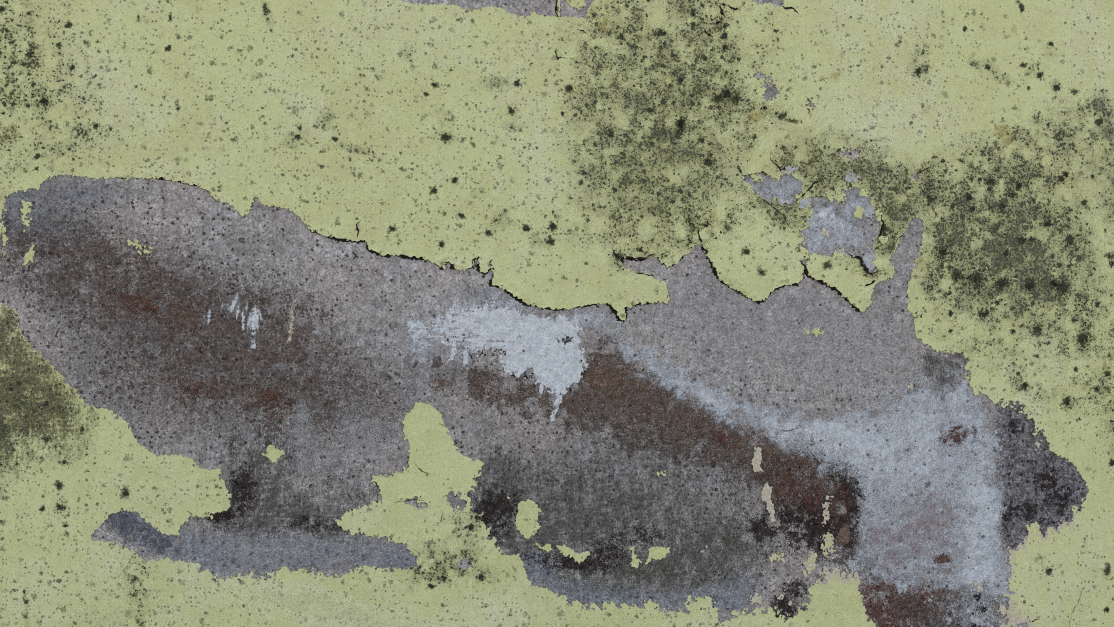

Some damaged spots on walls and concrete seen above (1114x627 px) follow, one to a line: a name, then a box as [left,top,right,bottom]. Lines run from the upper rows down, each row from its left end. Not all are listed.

damp [0,0,112,174]
peeling [393,0,594,19]
damp [0,184,103,241]
damp [561,0,1114,361]
damp [0,308,99,477]
damp [39,480,70,527]
peeling [0,147,1089,627]
damp [105,284,1023,627]
corrosion [429,334,976,627]
damp [1000,359,1049,401]
damp [1060,371,1114,435]